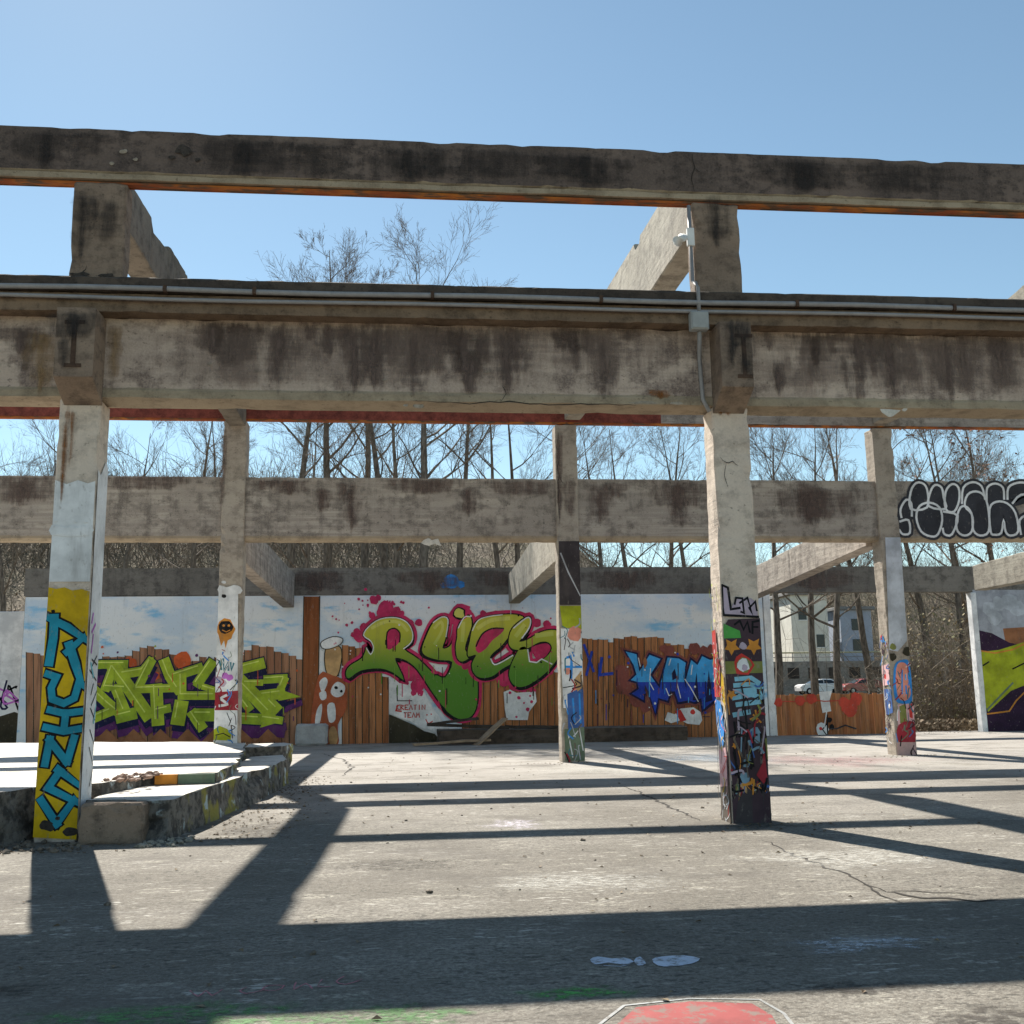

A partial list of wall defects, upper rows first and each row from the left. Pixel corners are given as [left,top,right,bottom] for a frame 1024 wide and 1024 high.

leakage [196,323,530,393]
leakage [553,329,617,392]
corrosion [60,412,74,499]
leakage [319,483,358,529]
leakage [392,478,476,515]
leakage [485,436,574,515]
leakage [777,484,856,524]